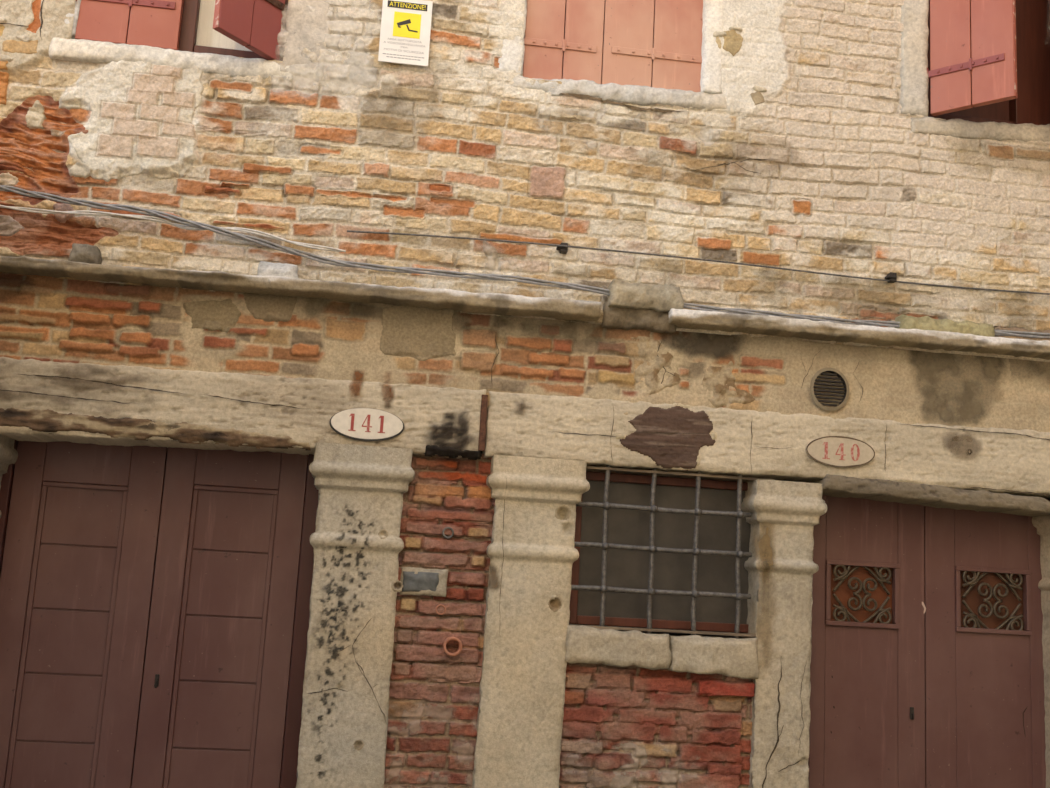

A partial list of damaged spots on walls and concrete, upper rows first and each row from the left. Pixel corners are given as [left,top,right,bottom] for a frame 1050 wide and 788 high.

peeling [0,0,41,71]
spalling [0,93,119,256]
peeling [146,163,179,180]
leakage [910,350,1003,423]
leakage [442,414,468,446]
leakage [317,506,373,720]
crack [762,656,807,788]